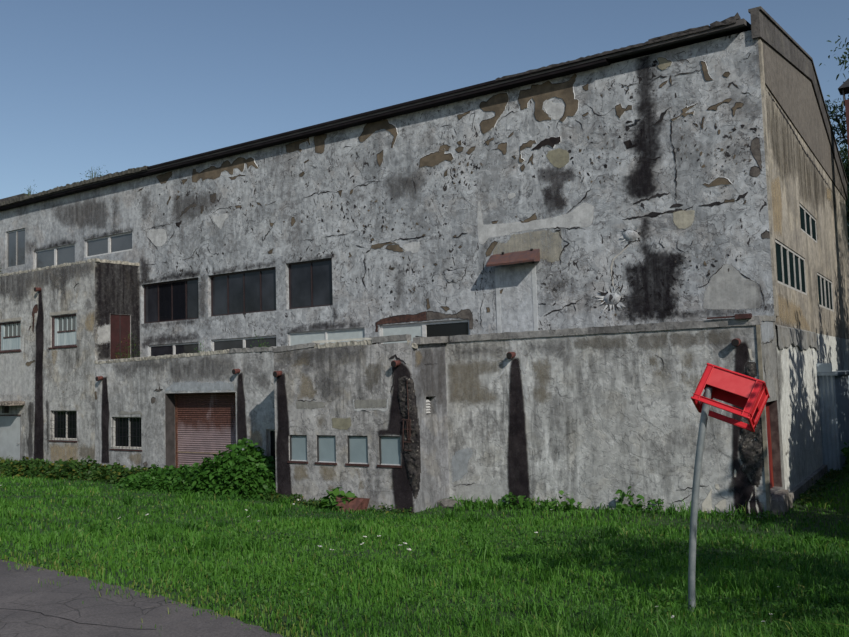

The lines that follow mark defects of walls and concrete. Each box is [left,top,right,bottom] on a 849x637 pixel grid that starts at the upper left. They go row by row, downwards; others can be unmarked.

peeling [156,171,172,184]
peeling [159,157,259,216]
peeling [358,119,398,166]
peeling [419,73,638,189]
crack [549,188,591,265]
leakage [623,56,661,198]
crack [548,103,748,220]
leakage [625,218,690,321]
crack [619,51,701,93]
leakage [0,261,162,463]
leakage [378,349,494,512]
leakage [508,358,529,506]